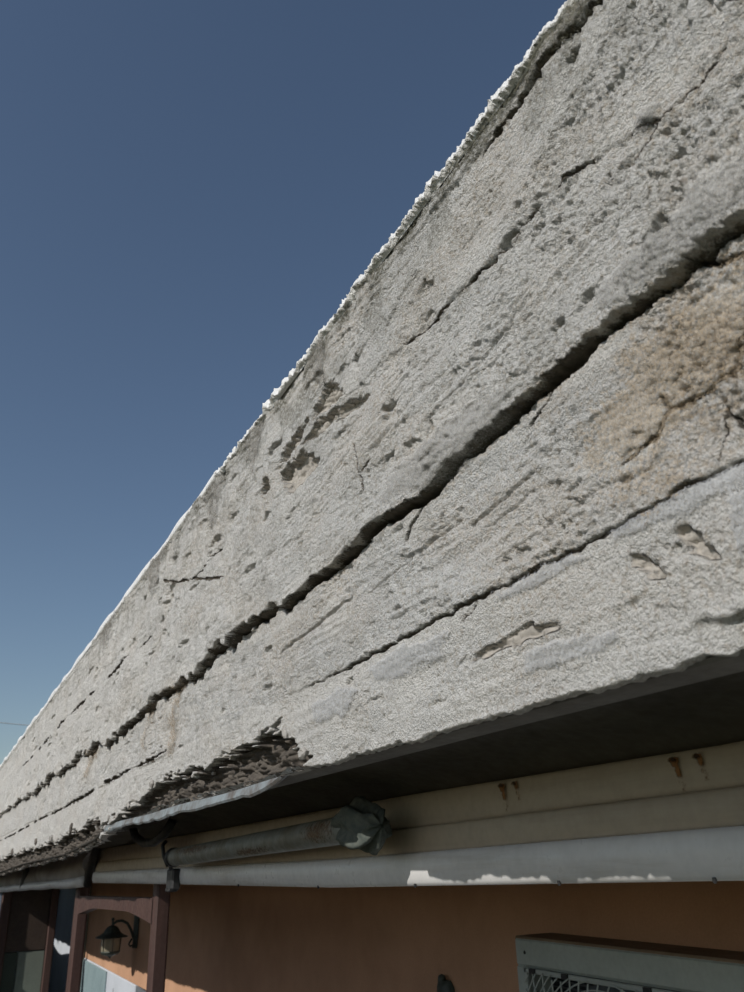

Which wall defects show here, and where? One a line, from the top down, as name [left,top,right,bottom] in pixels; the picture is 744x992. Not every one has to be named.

spalling [0,721,313,875]
crack [0,224,744,841]